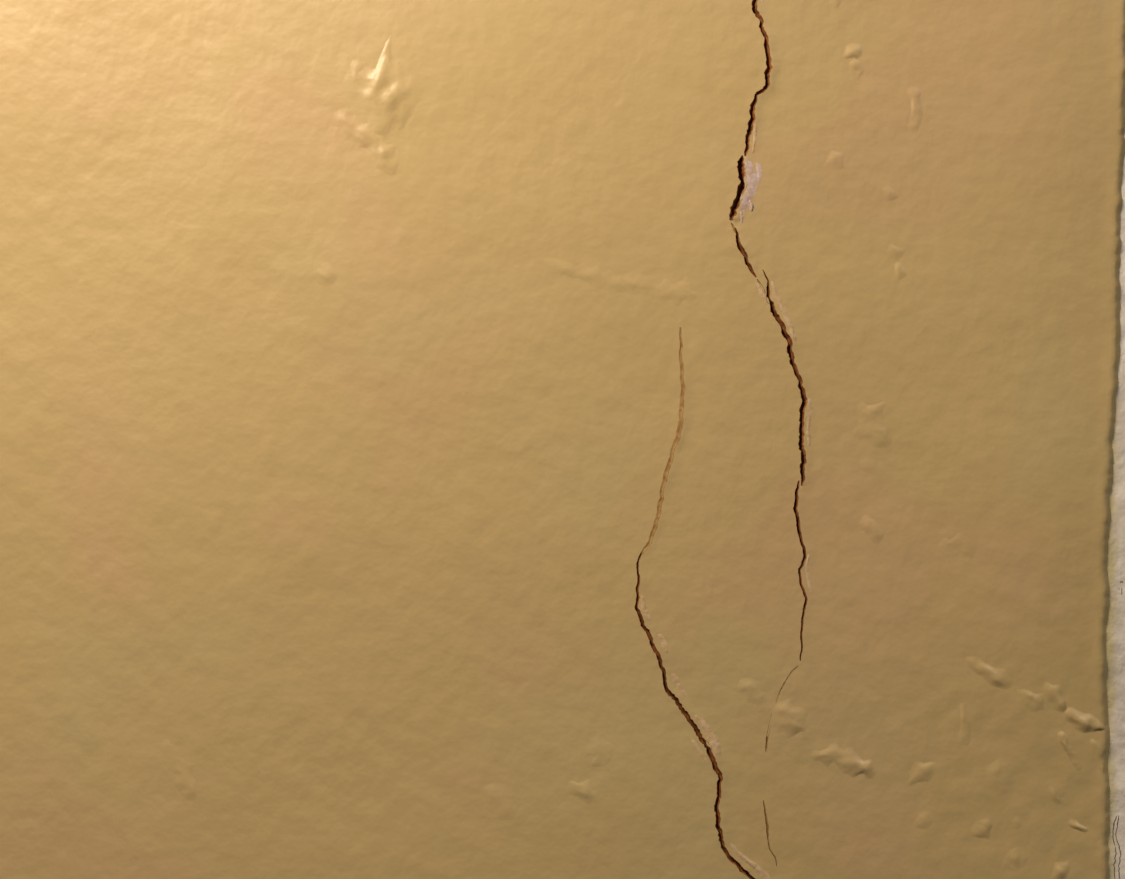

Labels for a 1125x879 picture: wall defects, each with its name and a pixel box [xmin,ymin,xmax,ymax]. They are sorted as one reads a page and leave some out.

crack [635,327,777,879]
flaking render [740,158,762,223]
crack [729,0,813,752]